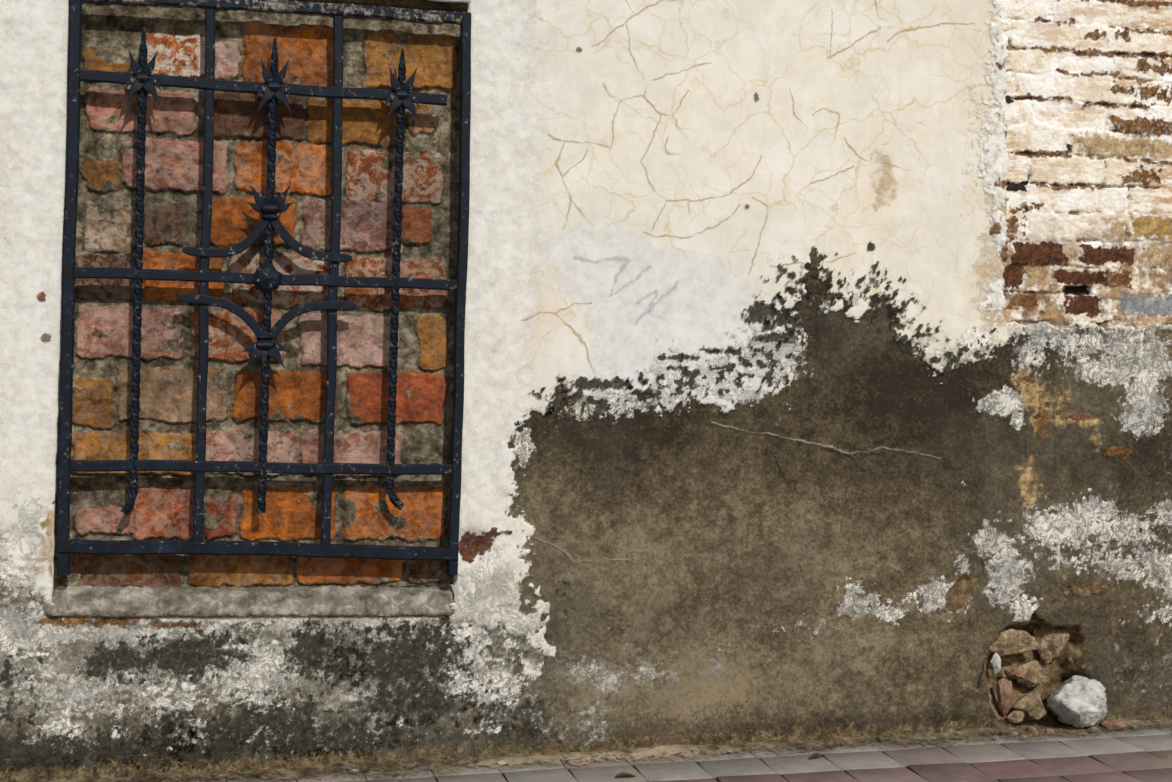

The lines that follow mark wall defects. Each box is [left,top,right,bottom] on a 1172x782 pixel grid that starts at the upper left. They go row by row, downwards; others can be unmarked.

crack [827,0,973,59]
crack [548,0,854,275]
crack [791,94,898,184]
flaking render [854,0,1172,442]
crack [521,302,595,373]
peeling [543,255,850,431]
peeling [513,423,537,476]
water stain [0,247,1172,782]
crack [711,421,937,487]
peeling [0,491,544,759]
peeling [563,652,679,747]
spalling [774,488,1172,727]